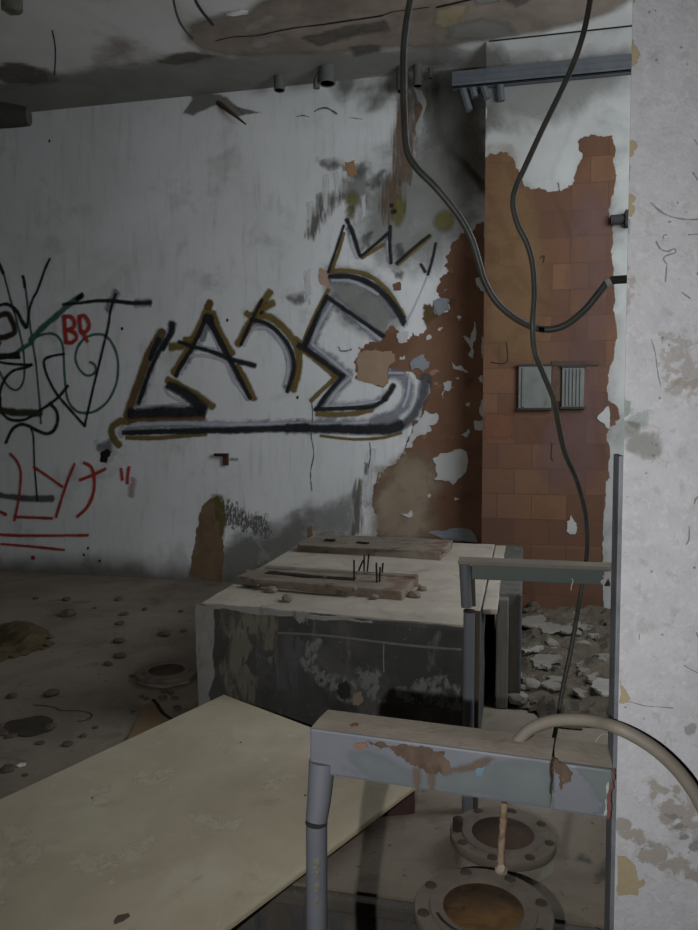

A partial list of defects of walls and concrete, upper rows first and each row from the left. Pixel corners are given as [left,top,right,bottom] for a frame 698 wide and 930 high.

crack [216,0,471,41]
damp [0,0,628,265]
damp [328,272,396,333]
flaking render [354,134,629,610]
flaking render [189,495,226,582]
peeling [195,603,372,706]
peeling [354,754,611,816]
flaking render [650,781,698,851]
flaking render [616,818,698,896]